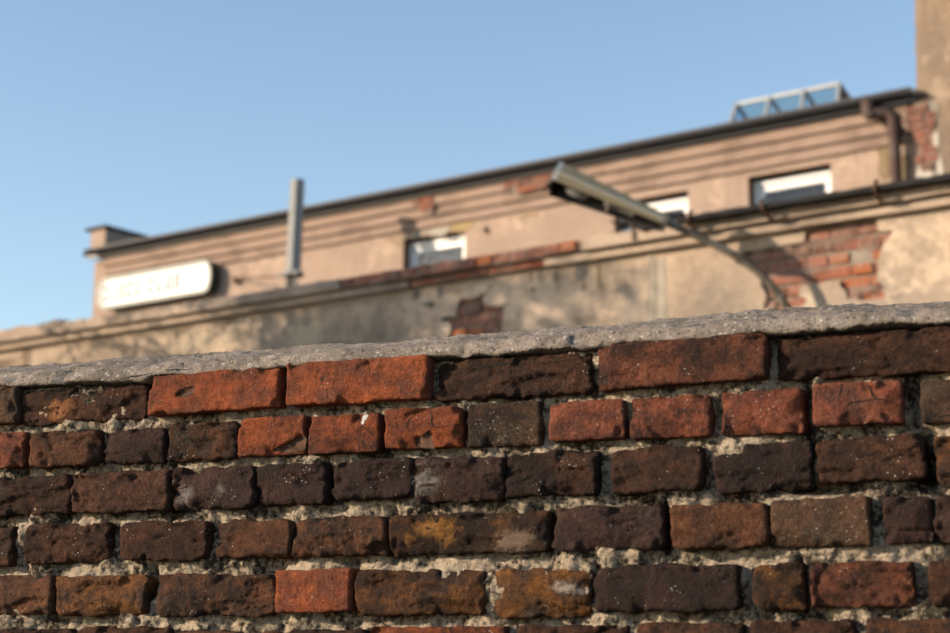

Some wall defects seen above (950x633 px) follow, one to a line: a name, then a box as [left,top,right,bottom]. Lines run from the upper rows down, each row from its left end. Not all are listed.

spalling [901,96,944,180]
peeling [877,146,890,179]
spalling [574,264,587,281]
spalling [742,219,893,310]
spalling [440,293,507,337]